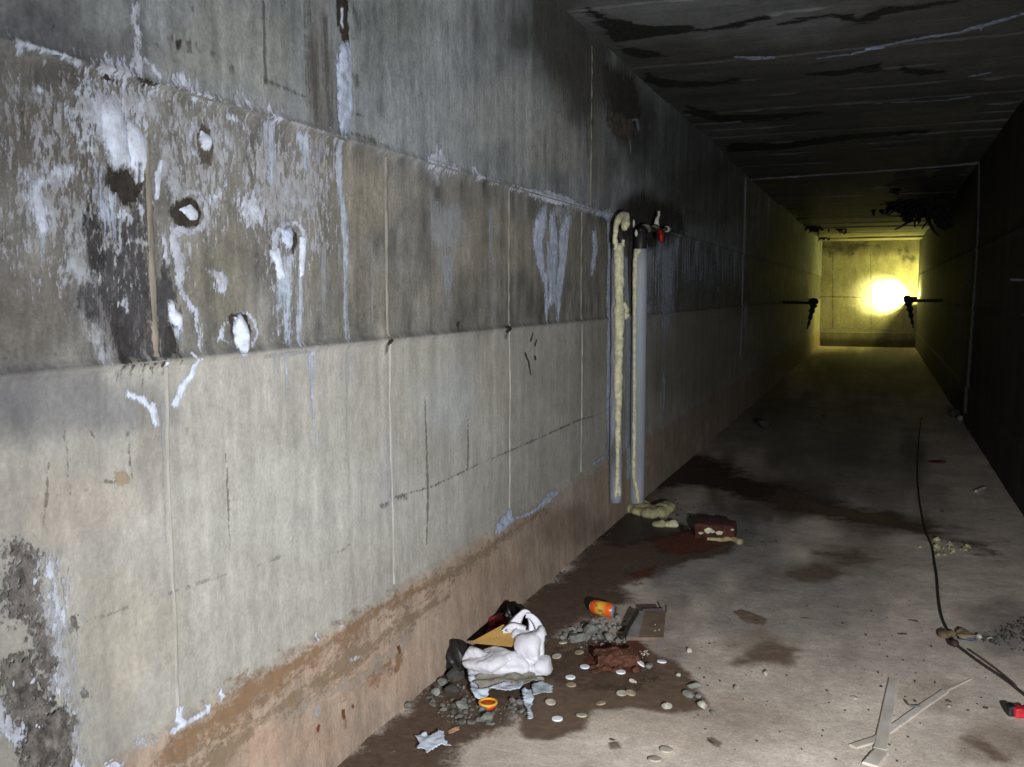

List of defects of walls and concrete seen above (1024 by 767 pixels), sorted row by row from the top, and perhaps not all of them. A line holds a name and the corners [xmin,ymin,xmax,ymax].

leakage [815,12,1024,59]
hole [103,165,144,207]
leakage [0,0,376,452]
leakage [425,141,985,479]
crack [404,402,593,545]
efflorescence [489,490,559,539]
spalling [0,536,92,767]
rust [156,508,547,767]